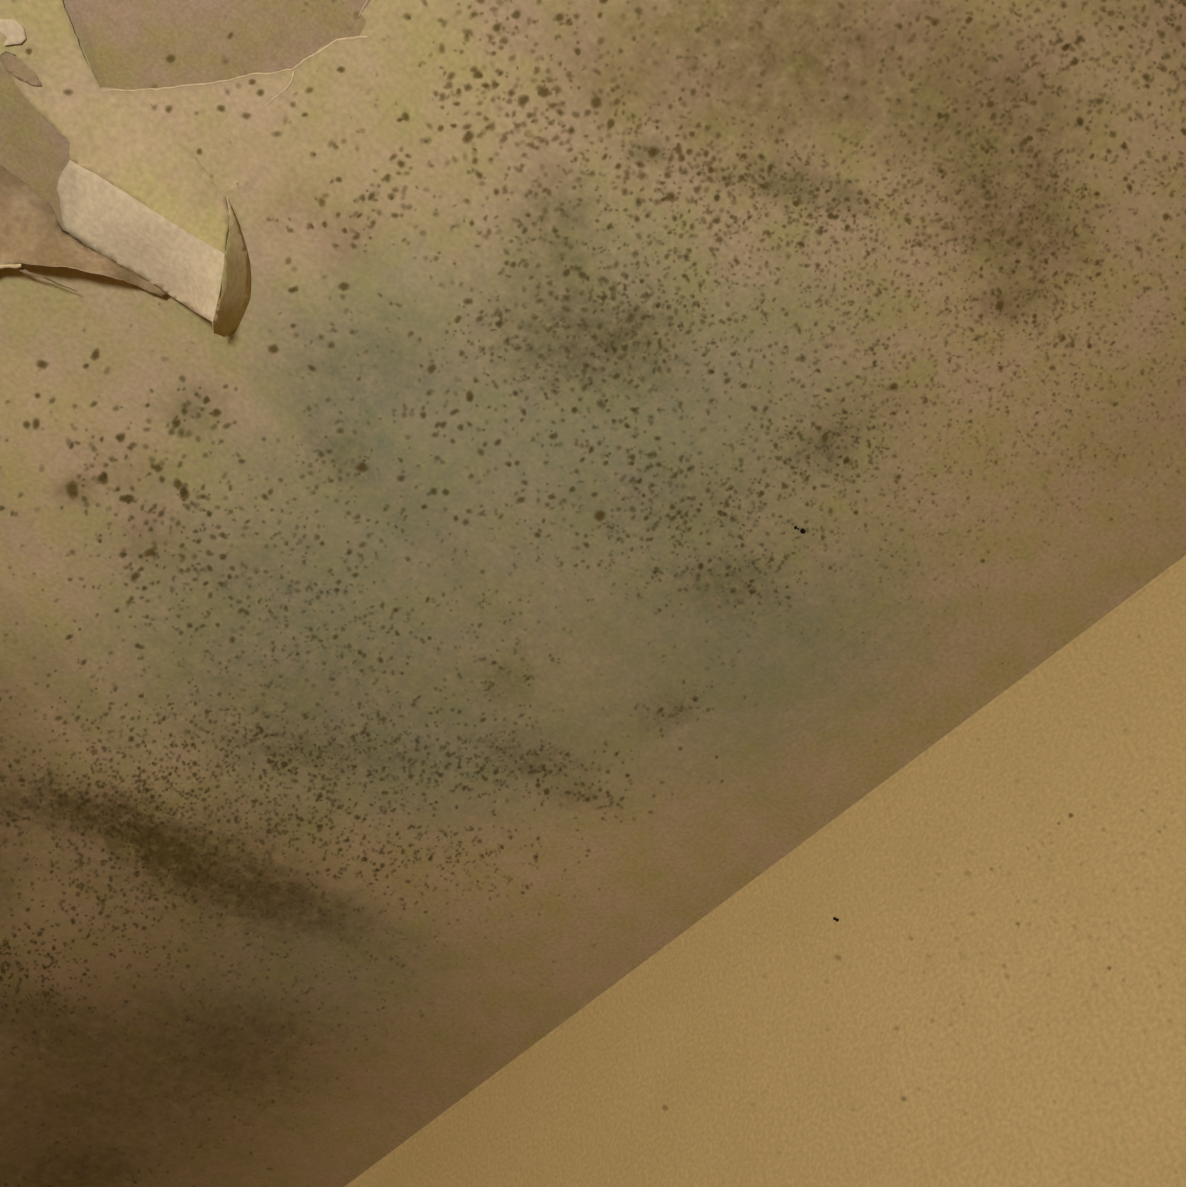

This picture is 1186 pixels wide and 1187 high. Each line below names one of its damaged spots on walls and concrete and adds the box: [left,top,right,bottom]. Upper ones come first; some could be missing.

peeling [0,19,26,45]
peeling [63,0,371,106]
leakage [449,68,502,105]
leakage [511,89,555,124]
peeling [0,61,81,242]
leakage [665,132,715,177]
leakage [151,465,193,504]
leakage [120,550,157,599]
leakage [0,915,89,1021]